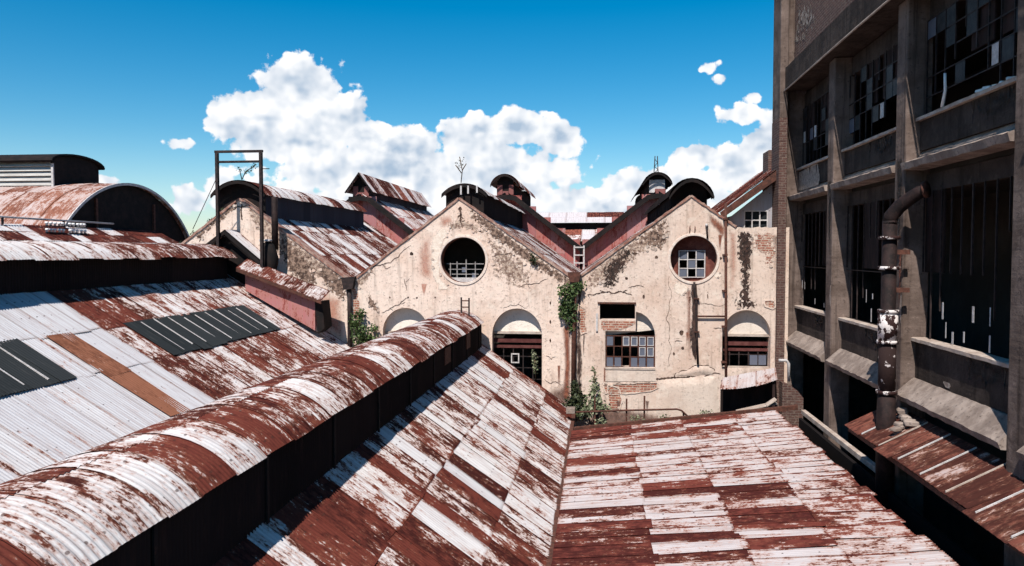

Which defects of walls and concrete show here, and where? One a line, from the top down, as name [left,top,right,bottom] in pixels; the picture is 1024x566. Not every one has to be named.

mould [603,248,633,289]
water stain [737,231,753,309]
flaking render [751,233,776,268]
corrosion [47,332,190,416]
corrosion [558,326,570,399]
flaking render [602,382,659,410]